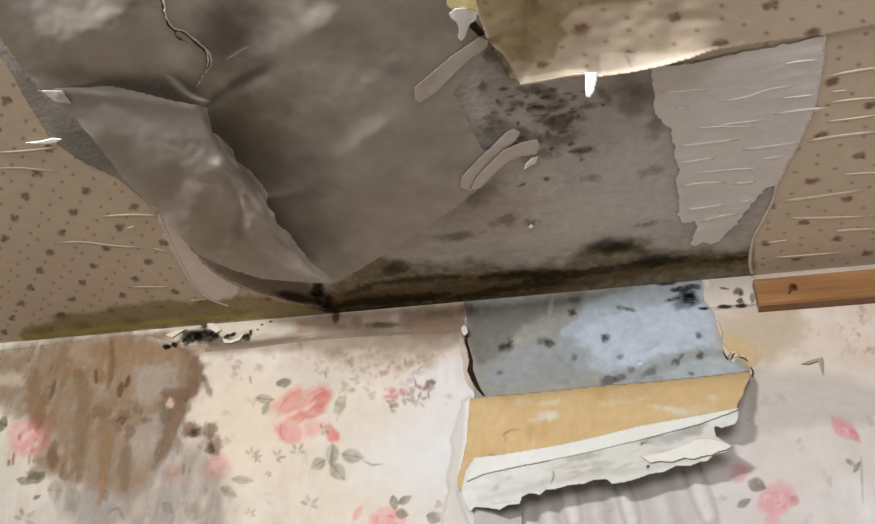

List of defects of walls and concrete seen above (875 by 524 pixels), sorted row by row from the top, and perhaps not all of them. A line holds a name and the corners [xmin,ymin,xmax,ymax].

crack [160,0,212,88]
peeling [0,0,875,398]
damp [519,86,579,133]
damp [0,242,754,524]